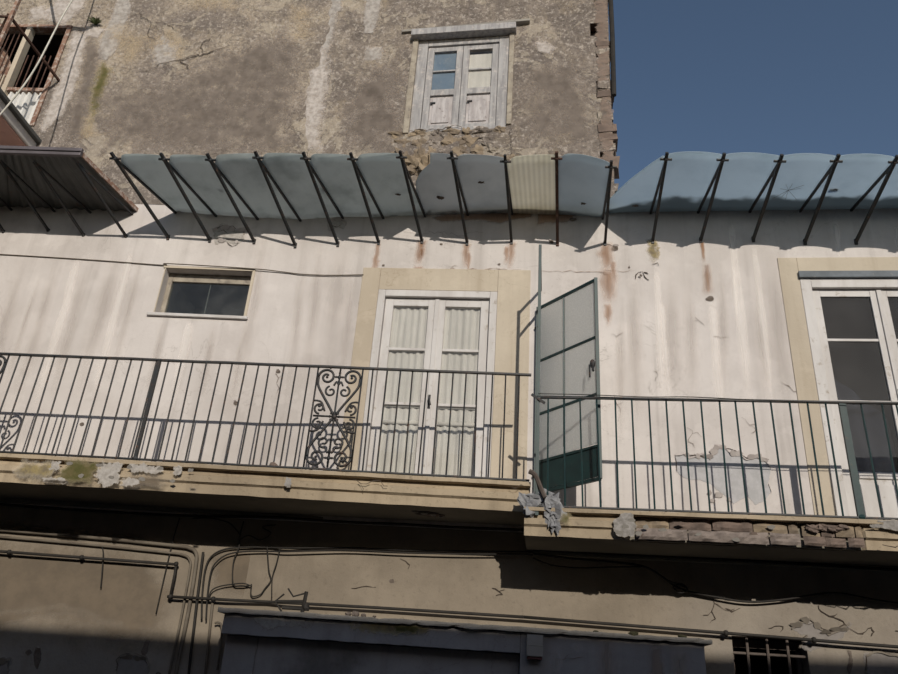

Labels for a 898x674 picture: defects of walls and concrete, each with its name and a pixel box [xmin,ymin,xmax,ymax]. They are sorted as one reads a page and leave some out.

water stain [69,36,109,139]
corrosion [599,244,617,320]
corrosion [700,242,710,291]
spalling [42,461,73,484]
spalling [78,462,193,487]
peeling [675,444,771,505]
spalling [613,513,898,548]
peeling [790,617,851,652]
crack [818,605,898,636]
peeling [864,650,898,674]